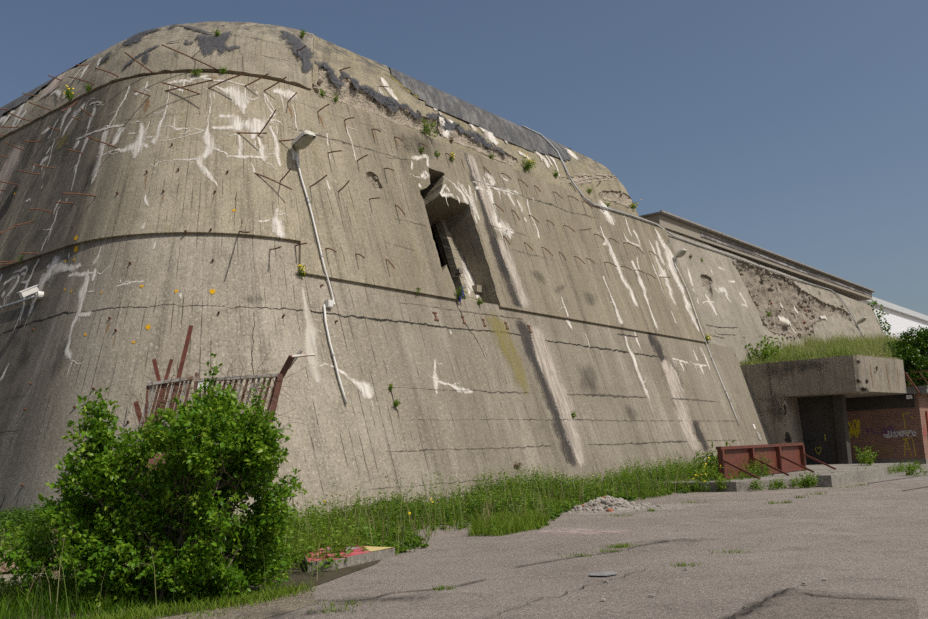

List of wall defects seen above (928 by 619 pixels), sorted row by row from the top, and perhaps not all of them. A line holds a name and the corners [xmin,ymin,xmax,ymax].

leakage [40,49,117,100]
spalling [312,60,517,166]
leakage [0,75,298,375]
leakage [440,154,540,308]
crack [0,302,660,367]
leakage [598,200,748,452]
spalling [732,261,850,340]
leakage [516,321,586,467]
crack [729,588,908,619]